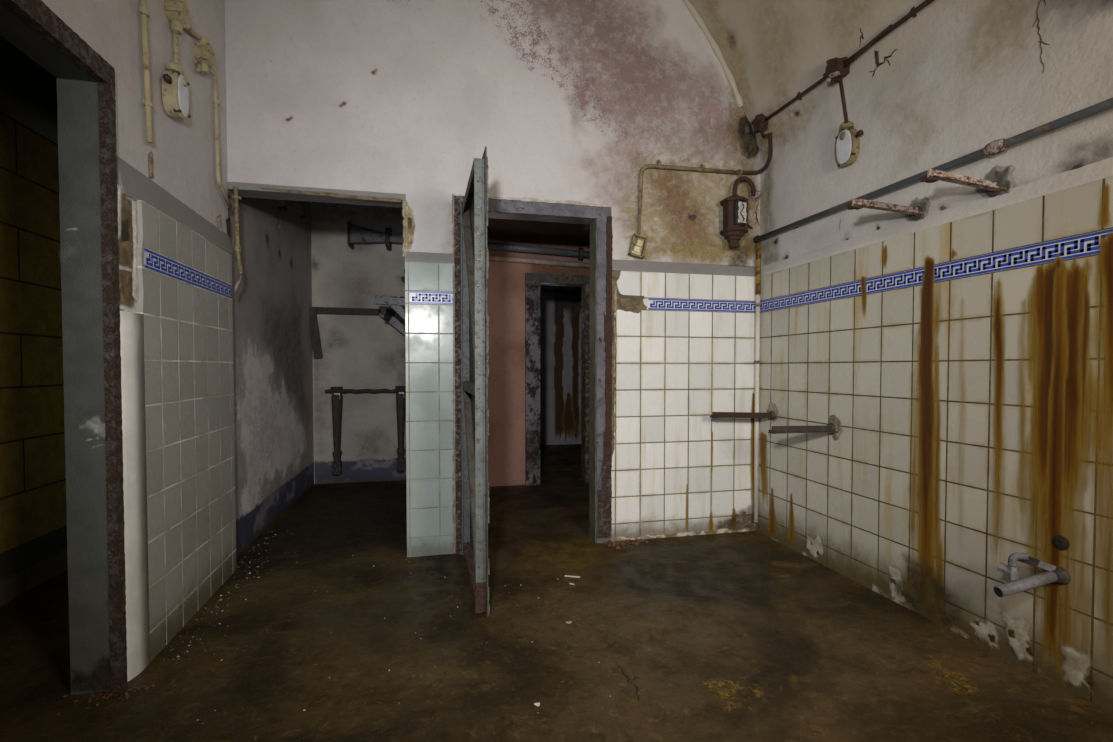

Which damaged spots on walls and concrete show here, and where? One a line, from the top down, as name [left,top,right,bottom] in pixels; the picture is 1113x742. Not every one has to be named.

crack [859,28,898,78]
crack [1033,0,1049,71]
leakage [489,0,773,266]
flaking render [263,188,415,256]
corrosion [554,298,579,441]
spalling [611,271,647,457]
corrosion [751,392,795,542]
corrosion [911,257,943,608]
corrosion [992,281,1004,546]
corrosion [1021,184,1113,676]
peeling [975,621,1015,643]